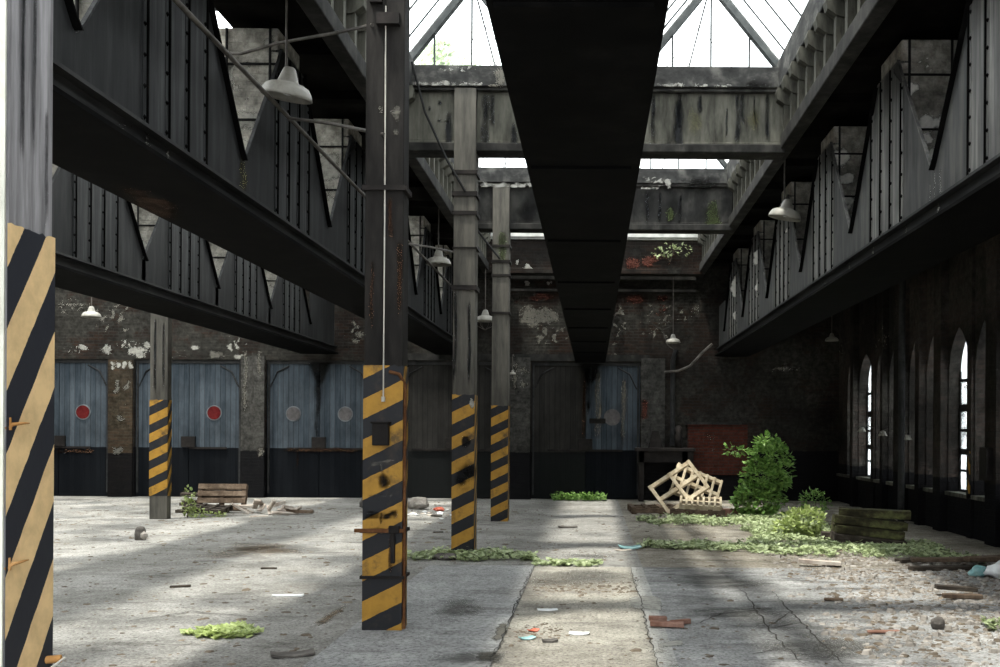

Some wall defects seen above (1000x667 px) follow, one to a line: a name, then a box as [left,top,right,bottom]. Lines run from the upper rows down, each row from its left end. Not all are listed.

water stain [414,66,494,143]
water stain [666,83,684,144]
water stain [726,95,769,140]
peeling [210,338,244,359]
peeling [520,305,568,344]
crack [700,587,842,665]